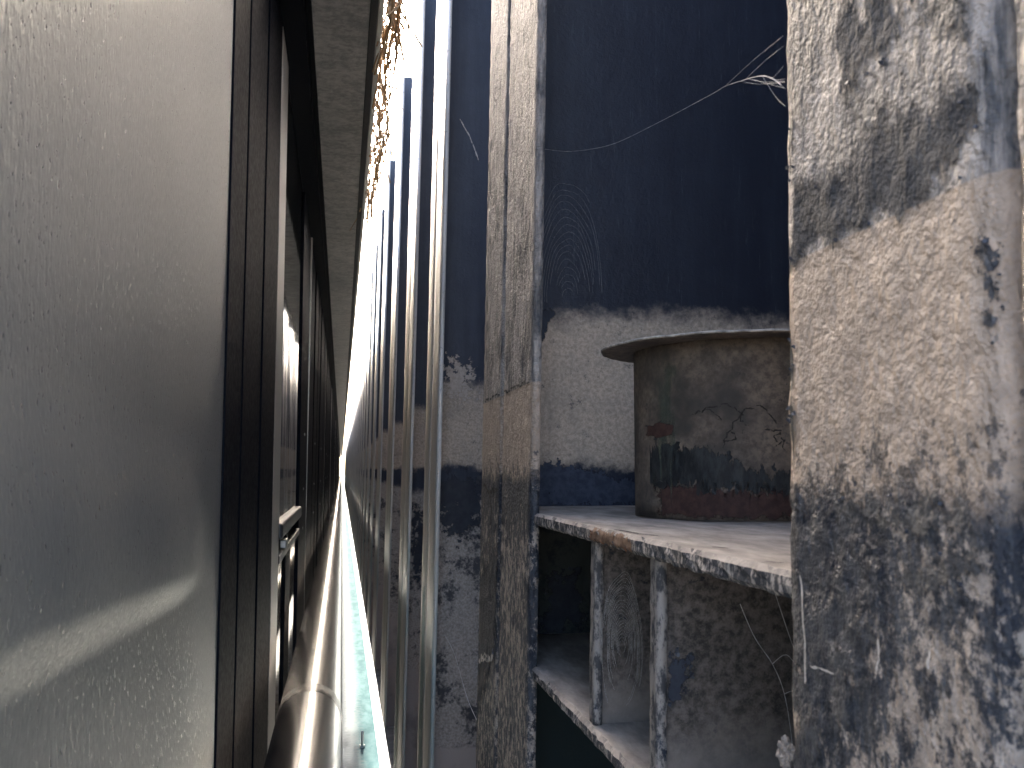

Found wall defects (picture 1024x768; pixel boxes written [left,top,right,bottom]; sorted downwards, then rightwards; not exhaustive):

peeling [443,352,481,410]
crack [694,403,785,450]
water stain [539,458,635,506]
peeling [440,463,501,709]